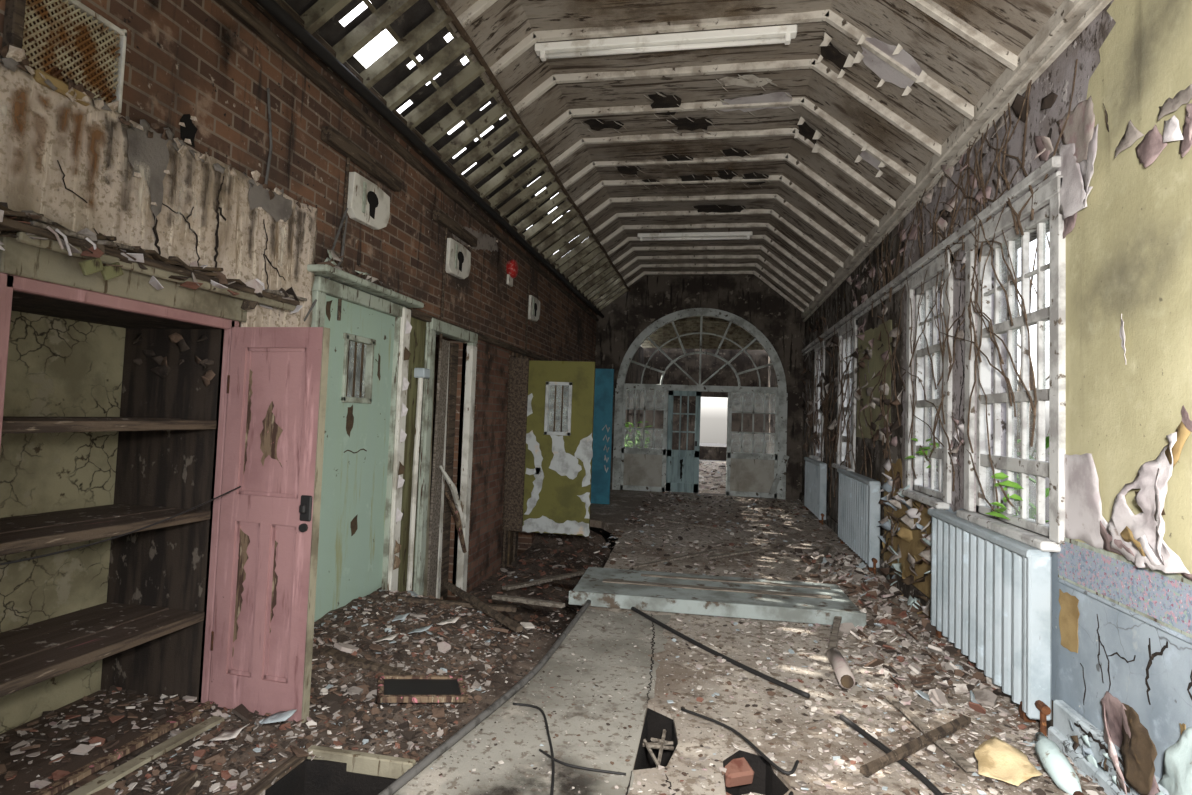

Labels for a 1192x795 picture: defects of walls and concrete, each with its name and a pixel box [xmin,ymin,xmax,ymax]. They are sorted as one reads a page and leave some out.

water stain [106,118,144,210]
spalling [0,45,317,223]
water stain [168,149,231,226]
peeling [991,92,1058,138]
peeling [1034,96,1109,239]
peeling [1115,84,1192,168]
water stain [271,209,312,281]
peeling [845,144,1002,618]
peeling [522,431,593,537]
crack [1074,615,1168,792]
peeling [1069,691,1192,795]
crack [1184,671,1192,700]